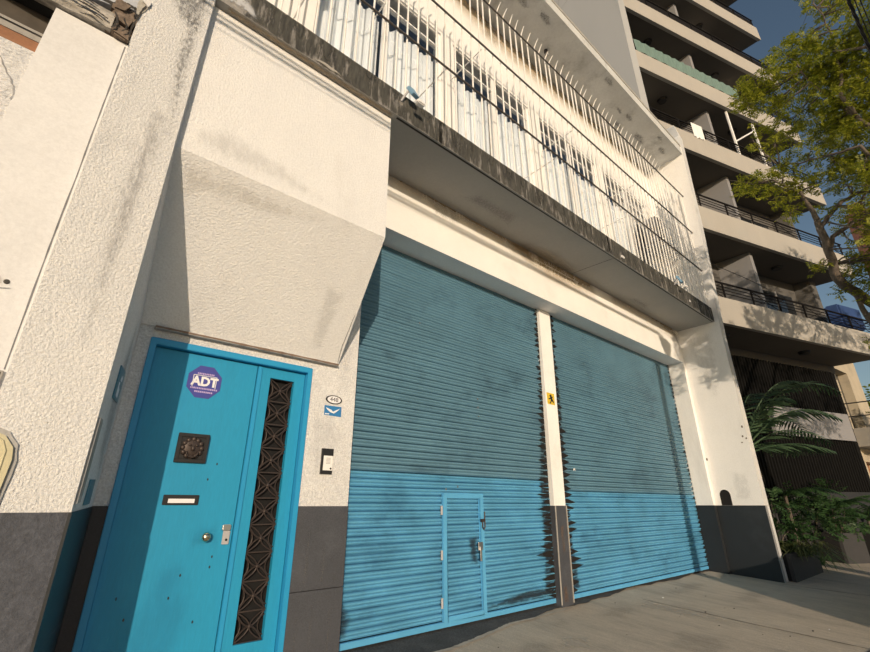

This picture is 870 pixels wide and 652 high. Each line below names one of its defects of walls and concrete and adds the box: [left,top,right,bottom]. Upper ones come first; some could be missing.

crack [77,0,108,21]
spalling [104,0,151,45]
crack [0,56,14,99]
damp [245,0,714,321]